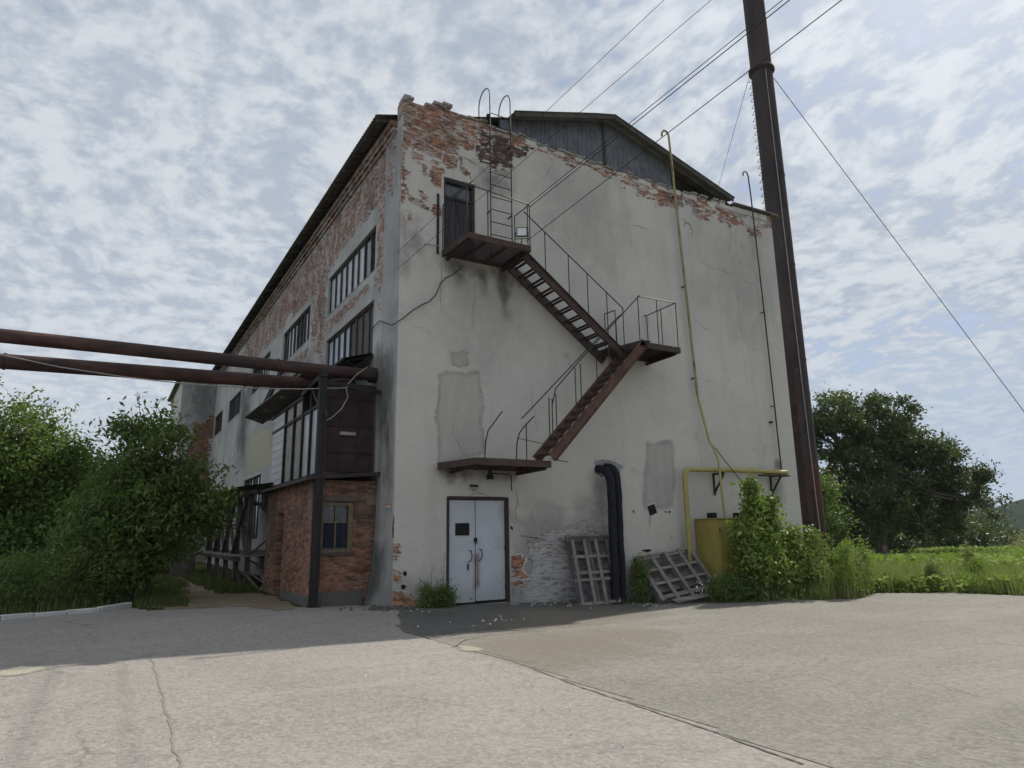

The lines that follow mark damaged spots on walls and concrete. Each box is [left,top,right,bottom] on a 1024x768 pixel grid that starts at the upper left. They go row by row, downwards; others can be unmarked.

spalling [401,103,770,239]
spalling [243,151,386,369]
spalling [184,415,214,482]
peeling [509,525,603,603]
crack [149,654,182,768]